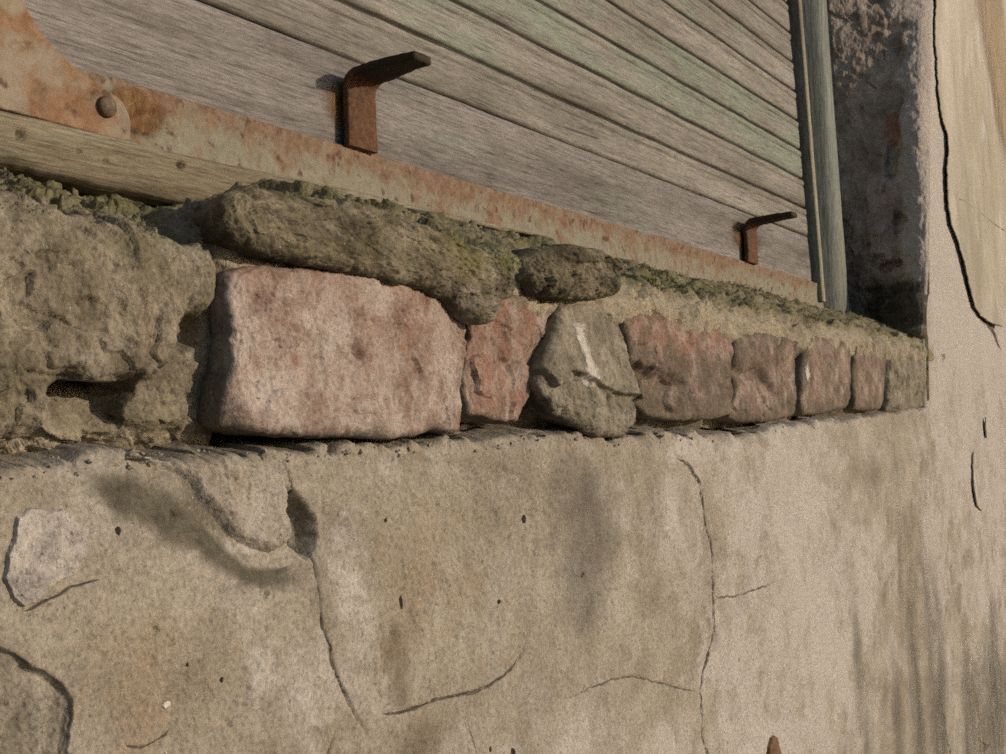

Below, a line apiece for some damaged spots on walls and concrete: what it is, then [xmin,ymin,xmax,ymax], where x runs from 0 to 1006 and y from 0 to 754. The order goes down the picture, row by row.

corrosion [331,82,344,127]
peeling [934,0,1006,349]
corrosion [736,223,745,250]
crack [286,542,357,721]
crack [575,458,769,754]
spalling [0,648,74,754]
crack [384,660,517,715]